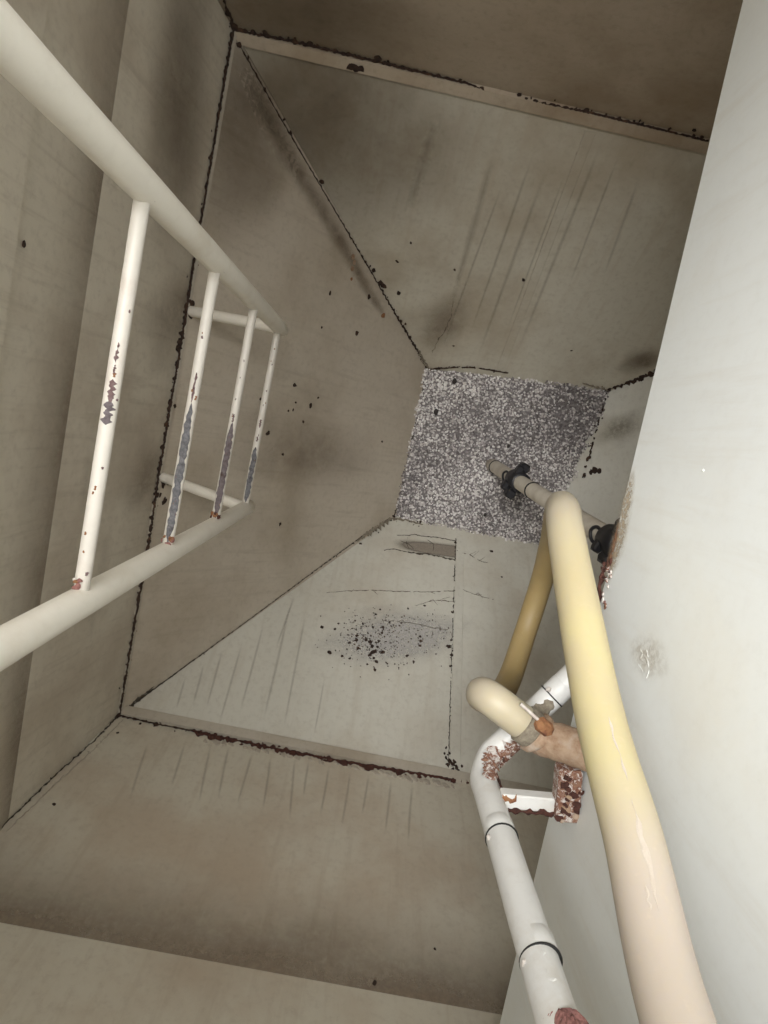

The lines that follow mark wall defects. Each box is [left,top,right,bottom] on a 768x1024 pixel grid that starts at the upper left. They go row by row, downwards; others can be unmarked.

corrosion [346,63,364,72]
corrosion [597,482,632,610]